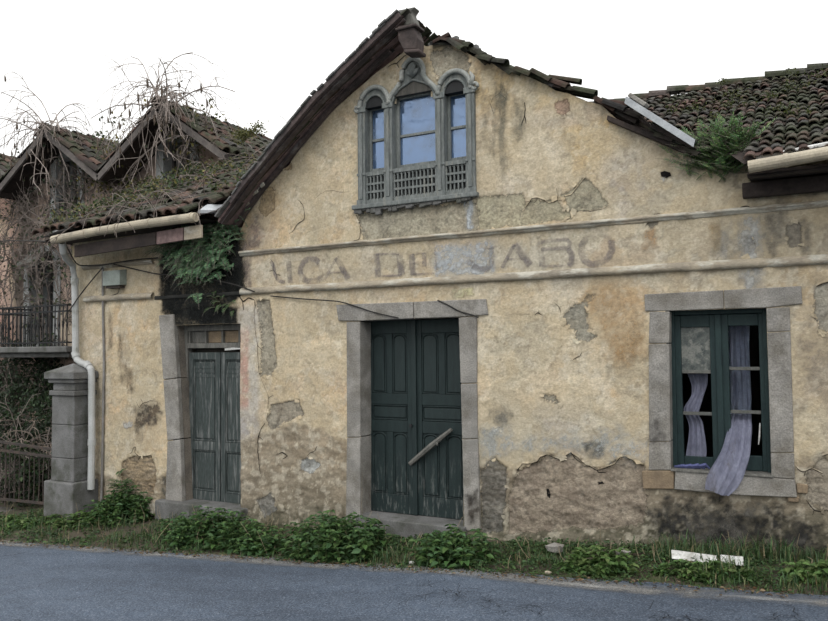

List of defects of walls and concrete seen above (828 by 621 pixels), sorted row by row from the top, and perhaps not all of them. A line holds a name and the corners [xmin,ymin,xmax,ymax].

flaking render [356,178,608,240]
flaking render [257,297,278,379]
flaking render [560,294,597,344]
flaking render [810,283,828,337]
flaking render [264,399,304,430]
flaking render [119,453,157,495]
flaking render [480,454,650,535]
flaking render [805,458,828,515]